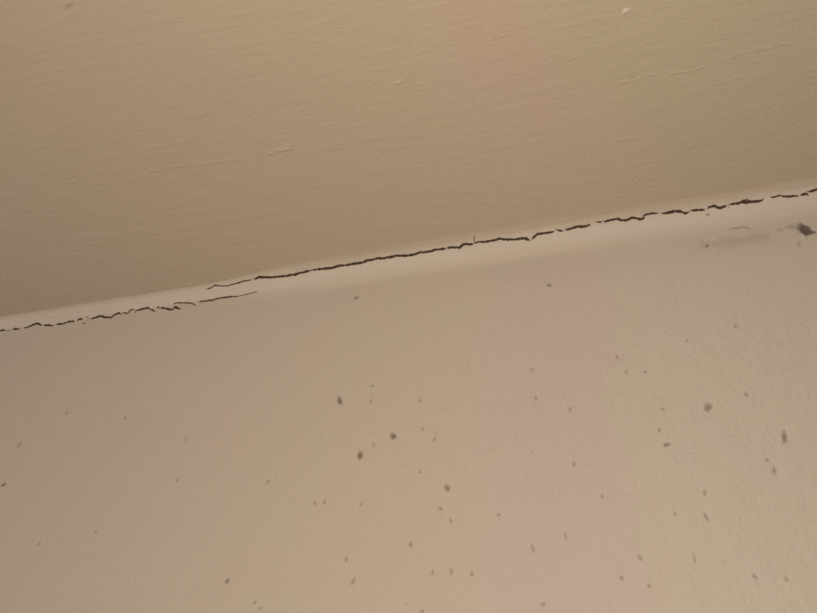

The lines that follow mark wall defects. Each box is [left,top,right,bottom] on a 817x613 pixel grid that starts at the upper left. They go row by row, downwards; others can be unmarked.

crack [0,188,817,331]